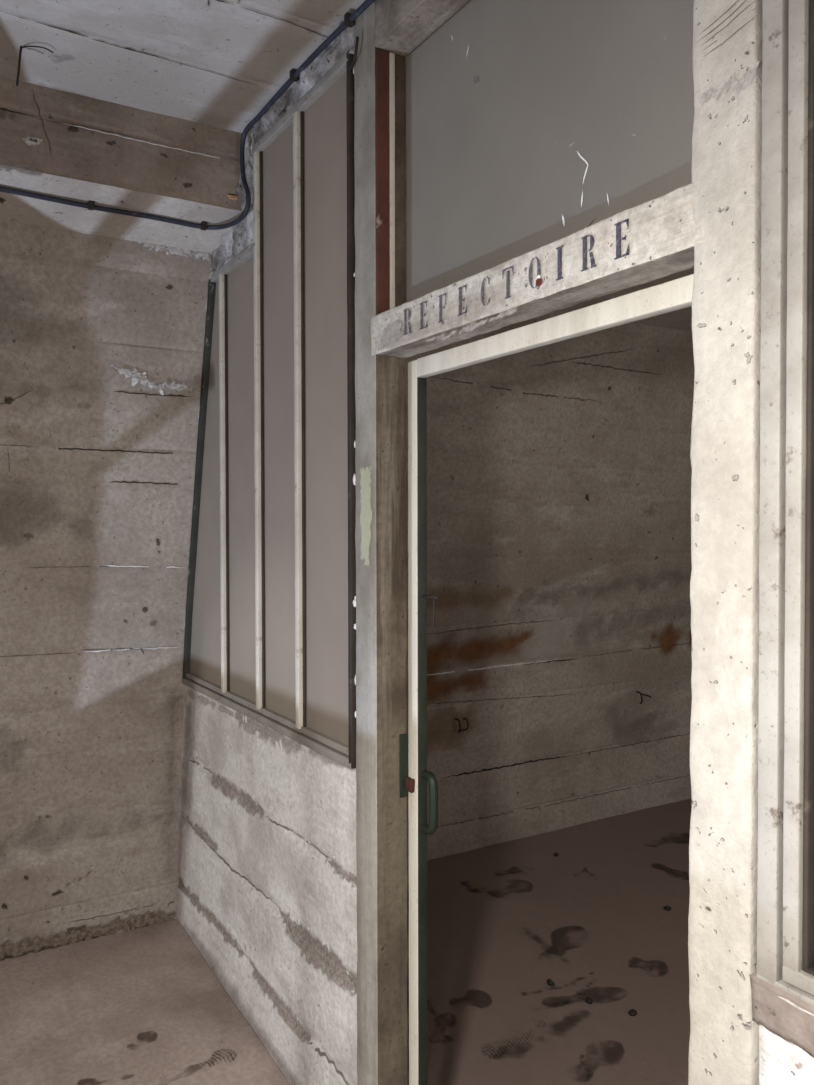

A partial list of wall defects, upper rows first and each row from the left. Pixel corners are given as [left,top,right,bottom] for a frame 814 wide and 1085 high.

corrosion [427,632,530,700]
corrosion [660,626,692,652]
spalling [0,902,175,961]